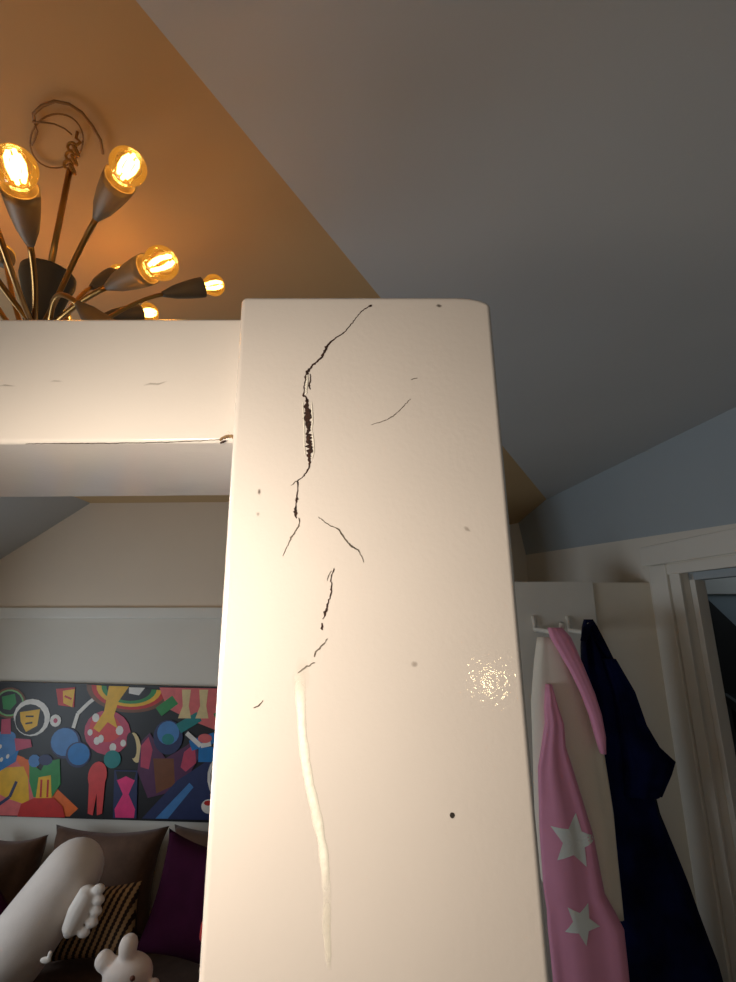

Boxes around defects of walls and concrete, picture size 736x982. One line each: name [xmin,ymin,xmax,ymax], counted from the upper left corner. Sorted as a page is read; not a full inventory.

crack [283,307,368,562]
crack [298,569,334,673]